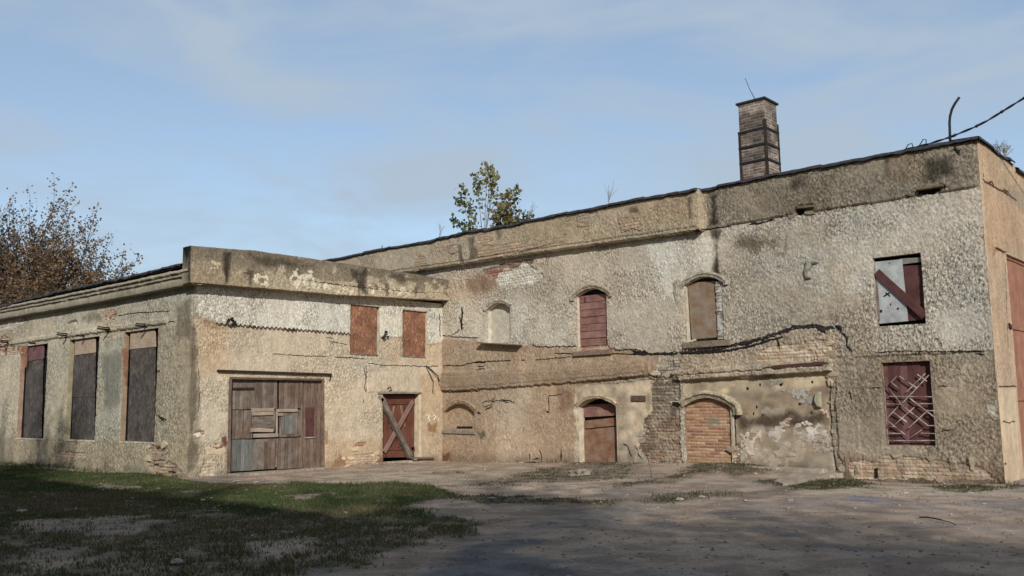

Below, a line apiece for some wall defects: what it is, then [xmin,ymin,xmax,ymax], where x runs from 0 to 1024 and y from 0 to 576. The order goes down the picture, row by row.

leakage [927,160,952,182]
leakage [351,269,368,291]
spalling [476,212,590,289]
leakage [711,196,721,239]
crack [272,281,577,414]
spalling [634,352,685,463]
spalling [726,340,996,483]
spalling [145,440,186,476]